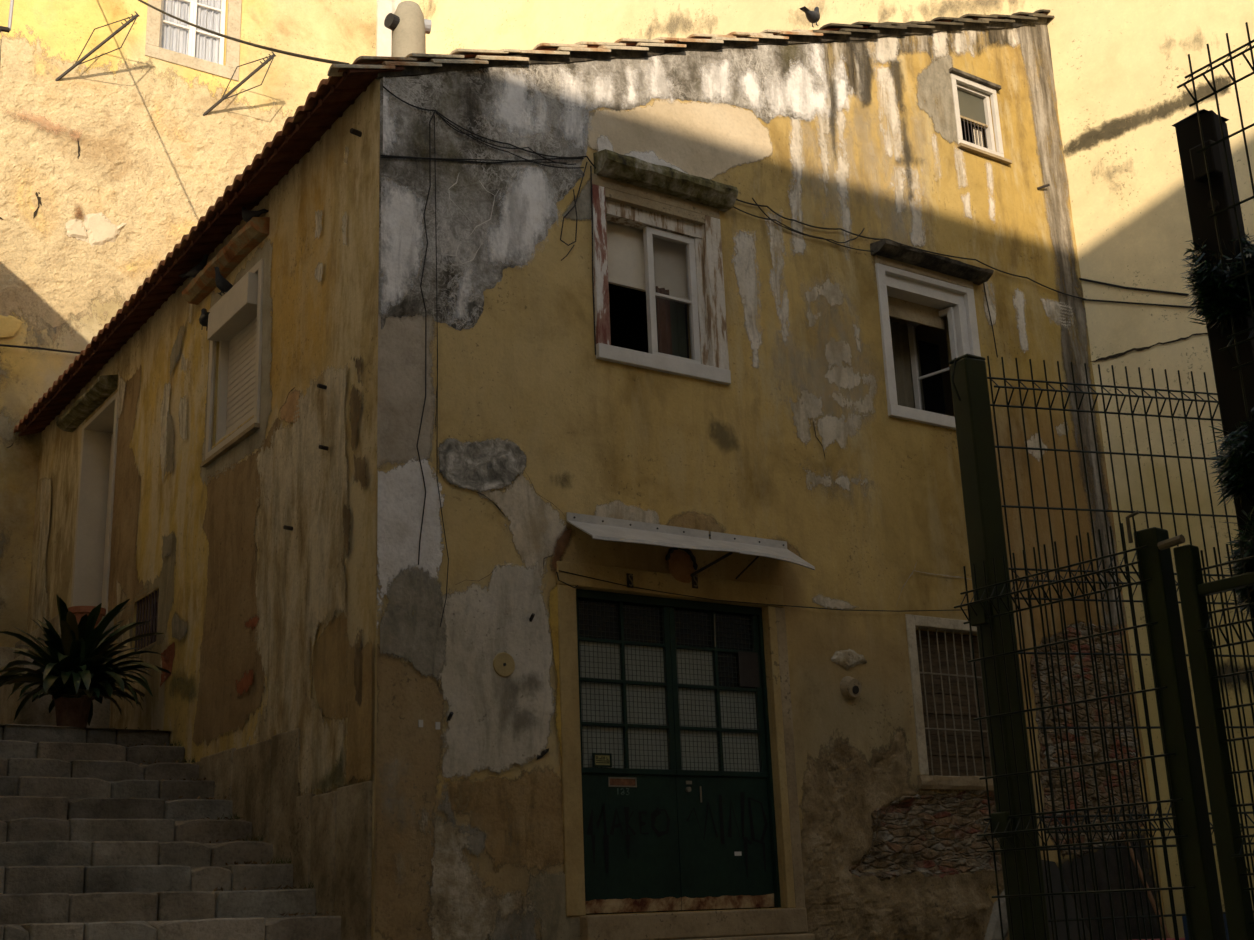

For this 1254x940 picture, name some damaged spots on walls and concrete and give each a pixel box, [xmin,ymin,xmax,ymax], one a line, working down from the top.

leakage [1063,76,1231,155]
spalling [0,25,291,344]
leakage [984,282,996,325]
leakage [1013,288,1028,353]
leakage [1041,299,1073,328]
flaking render [349,24,1145,859]
peeling [343,505,351,558]
flaking render [192,418,280,746]
spalling [418,811,536,940]
spalling [848,790,1002,881]